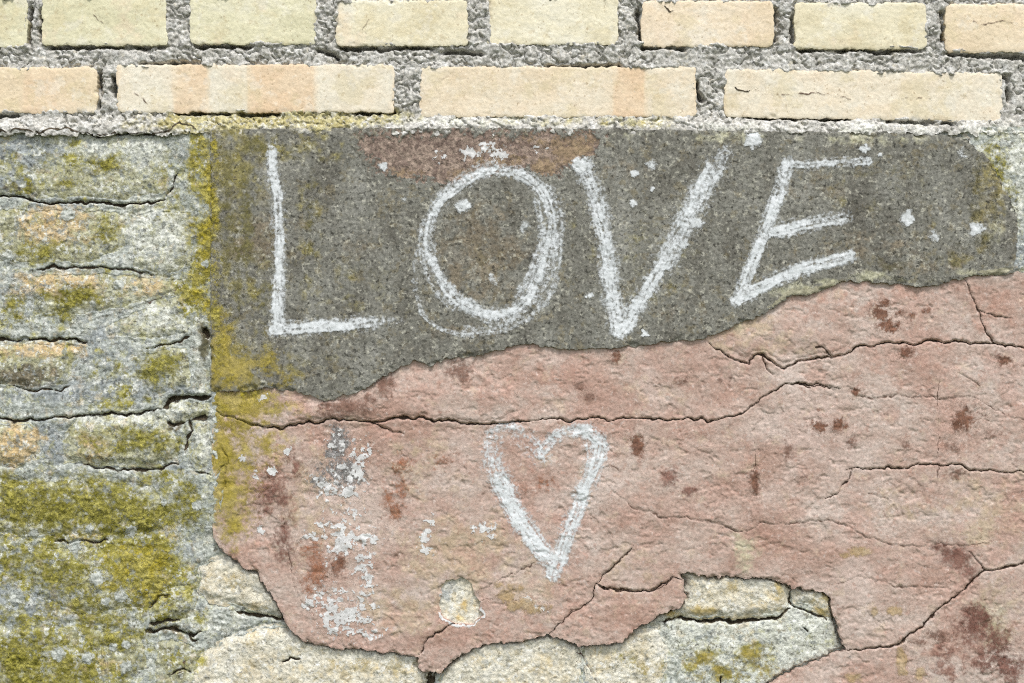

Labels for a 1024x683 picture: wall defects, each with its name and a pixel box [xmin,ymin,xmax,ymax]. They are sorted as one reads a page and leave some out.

spalling [354,128,608,187]
crack [0,280,1024,475]
crack [628,388,1024,532]
crack [236,611,284,620]
leakage [301,503,388,643]
spalling [438,577,486,628]
peeling [496,583,552,614]
spalling [432,633,625,676]
crack [598,545,674,592]
spalling [634,572,842,678]
crack [659,591,827,632]
crack [847,542,1023,651]